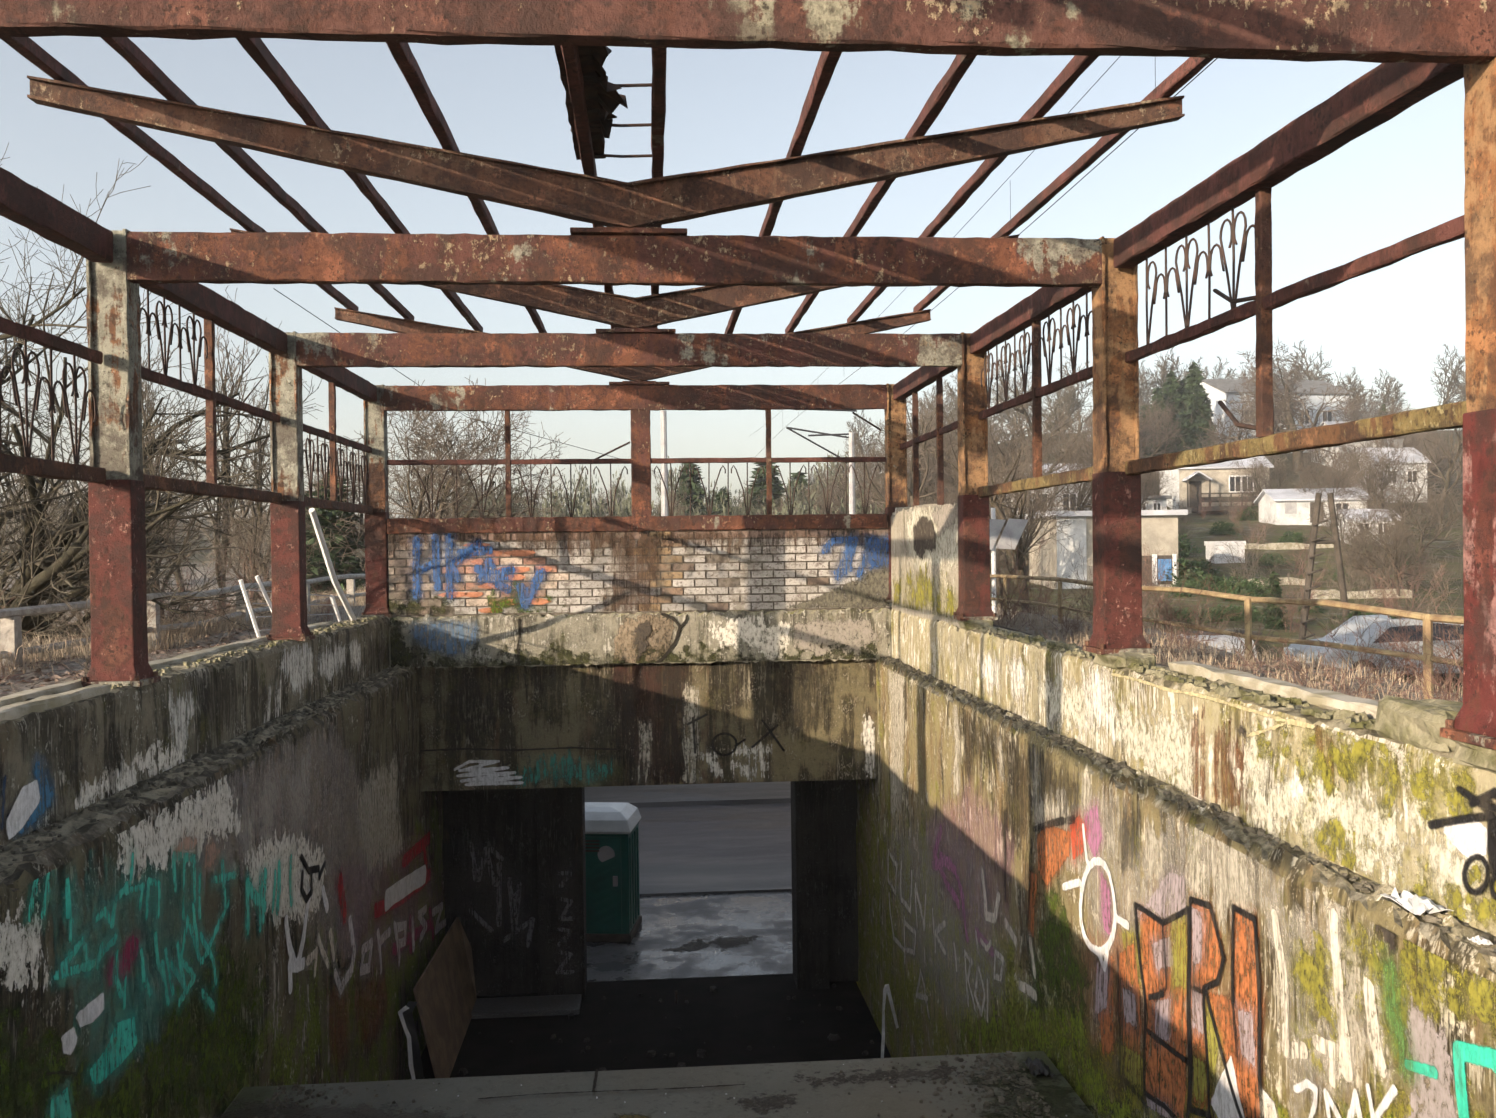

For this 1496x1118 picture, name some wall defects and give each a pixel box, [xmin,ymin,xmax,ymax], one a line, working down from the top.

water stain [442,622,578,746]
water stain [607,614,838,785]
water stain [888,669,905,822]
water stain [977,651,1026,704]
water stain [951,705,1254,941]
corrosion [1191,708,1250,816]
corrosion [1315,725,1336,814]
water stain [0,930,57,1118]
water stain [1326,905,1383,1089]